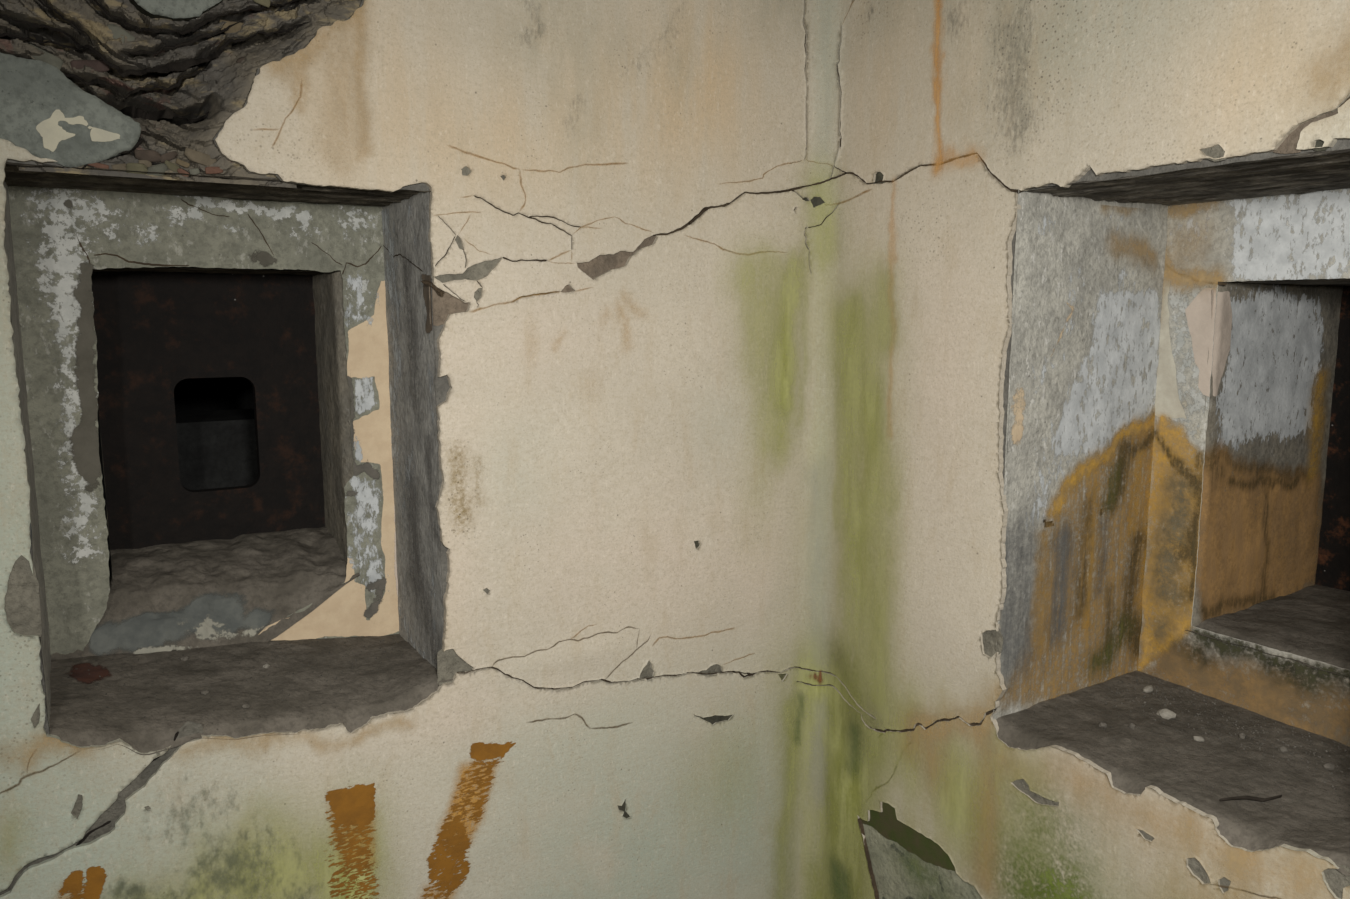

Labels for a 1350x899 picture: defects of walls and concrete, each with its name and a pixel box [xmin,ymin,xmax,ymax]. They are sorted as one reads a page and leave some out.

spalling [0,0,362,564]
crack [181,199,274,255]
peeling [333,205,378,243]
crack [311,2,1023,311]
corrosion [934,0,942,169]
peeling [133,270,399,654]
flaking render [5,555,42,637]
flaking render [437,649,473,686]
crack [457,625,997,801]
crack [0,721,203,895]
flaking render [858,802,982,899]